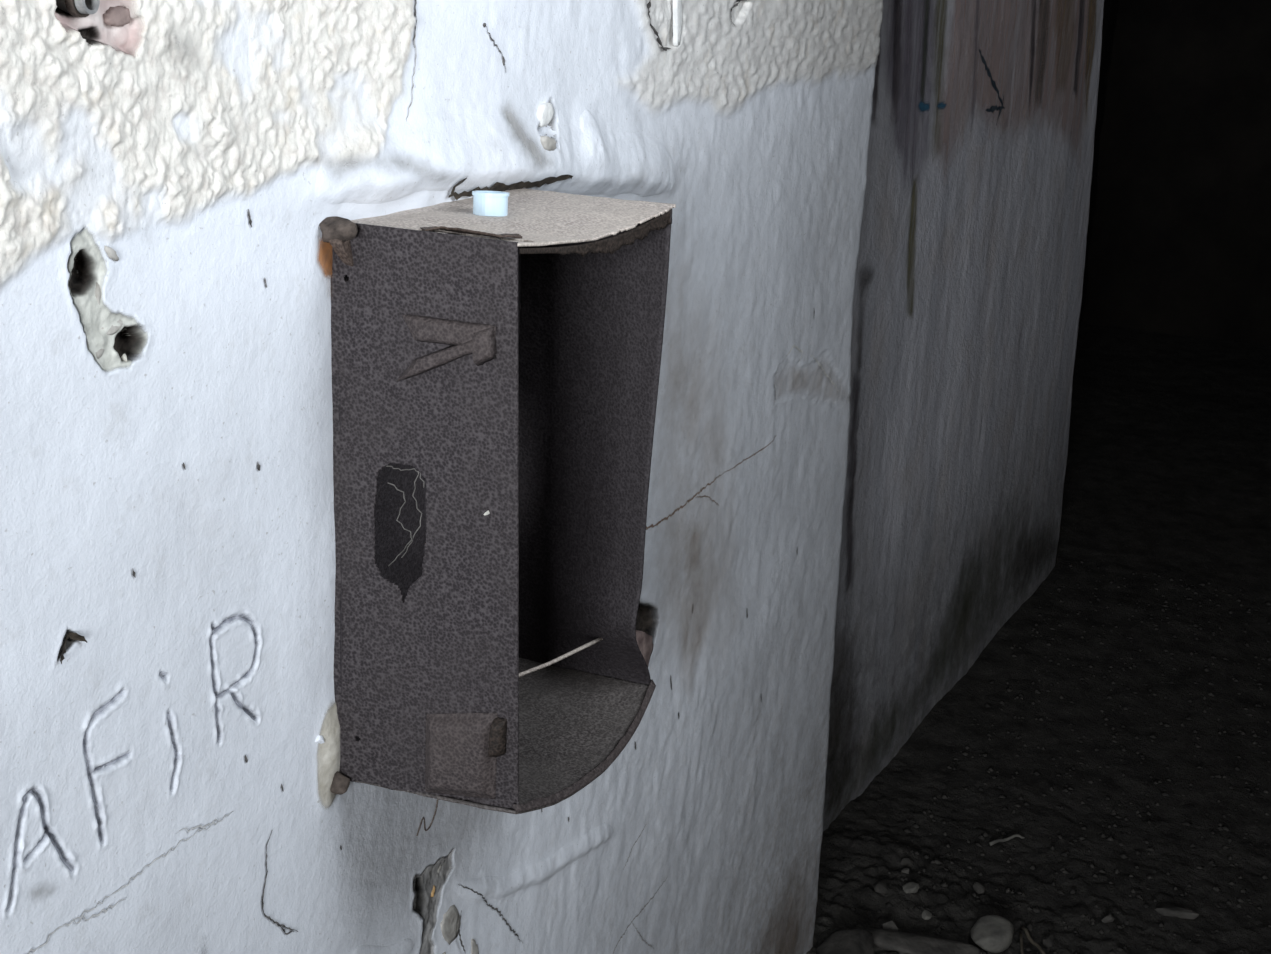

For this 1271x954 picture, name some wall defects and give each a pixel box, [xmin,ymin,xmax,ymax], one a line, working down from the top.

spalling [54,0,143,55]
peeling [646,0,685,51]
leakage [1016,0,1096,132]
leakage [873,0,1017,314]
spalling [67,229,147,371]
crack [646,437,775,529]
peeling [58,630,87,664]
spalling [636,604,658,667]
crack [28,811,233,954]
spalling [413,849,479,954]